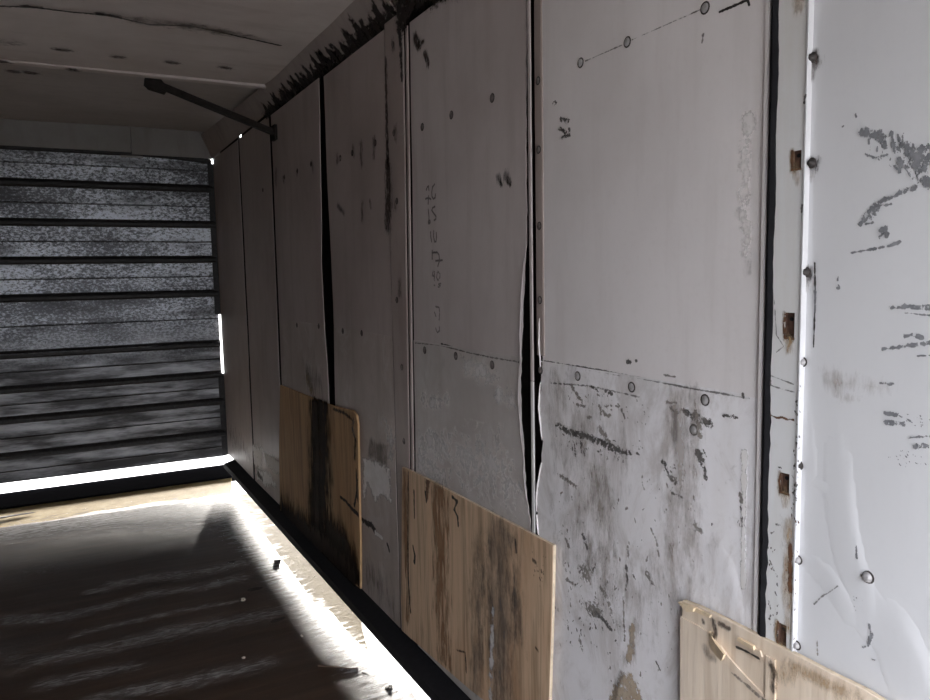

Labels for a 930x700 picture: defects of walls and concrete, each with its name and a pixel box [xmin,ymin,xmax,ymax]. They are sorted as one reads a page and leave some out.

mould [262,0,446,119]
peeling [858,127,930,239]
peeling [333,408,392,503]
water stain [623,546,636,664]
water stain [702,618,731,640]
corrosion [767,527,793,647]
water stain [734,646,844,700]